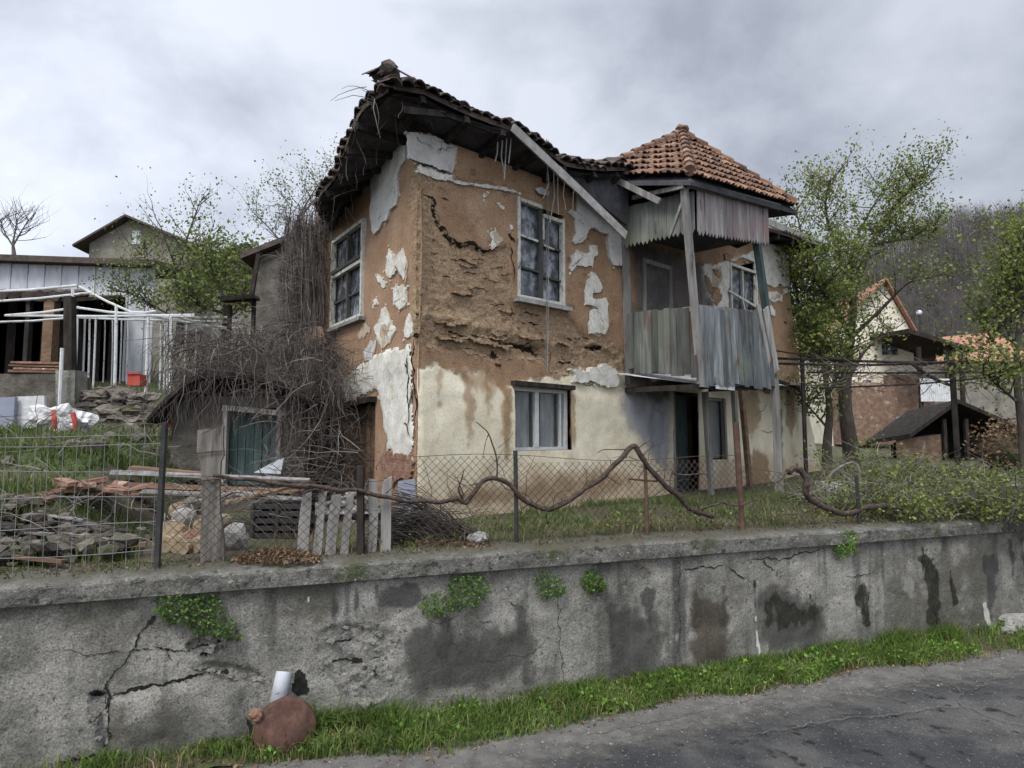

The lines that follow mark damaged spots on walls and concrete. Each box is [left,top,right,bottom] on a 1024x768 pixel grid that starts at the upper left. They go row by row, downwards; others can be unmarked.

peeling [369,131,521,235]
peeling [357,245,414,362]
peeling [487,224,513,250]
crack [410,158,602,373]
peeling [567,193,623,337]
peeling [697,243,789,317]
crack [28,616,243,763]
spalling [315,623,400,709]
leakage [407,594,533,687]
crack [676,548,823,665]
leakage [753,572,824,654]
leakage [983,554,999,625]